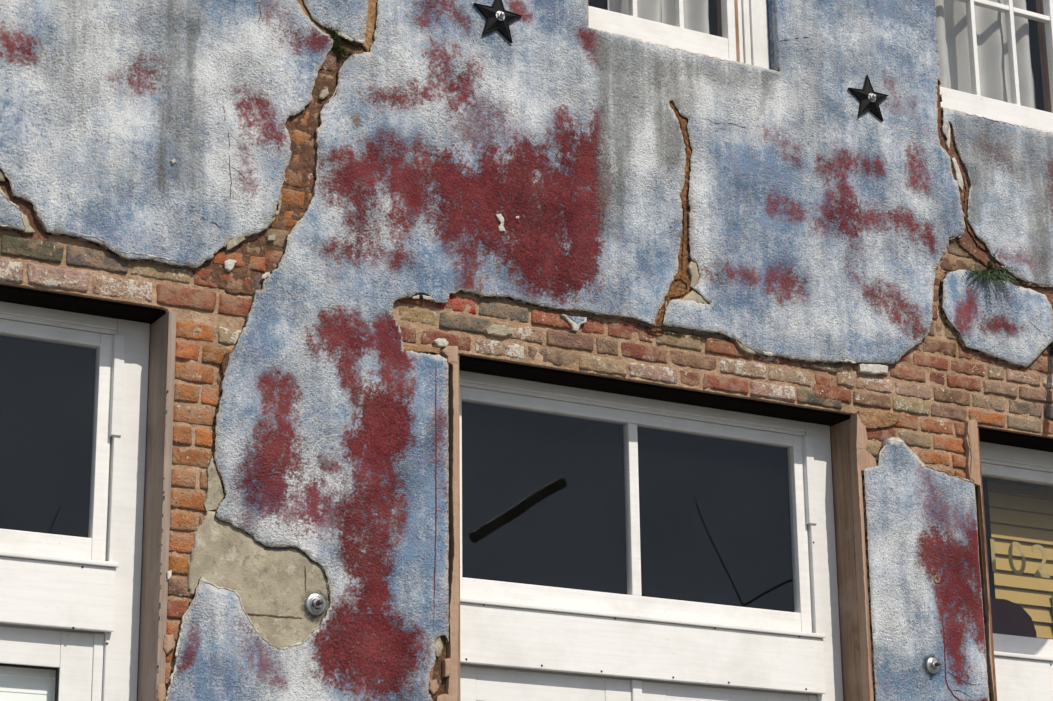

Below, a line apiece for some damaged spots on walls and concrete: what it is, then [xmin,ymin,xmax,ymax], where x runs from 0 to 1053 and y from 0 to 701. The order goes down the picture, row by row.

peeling [234,84,286,191]
peeling [260,0,330,54]
peeling [319,36,611,304]
crack [647,101,745,336]
flaking render [0,225,1053,701]
crack [941,606,976,701]